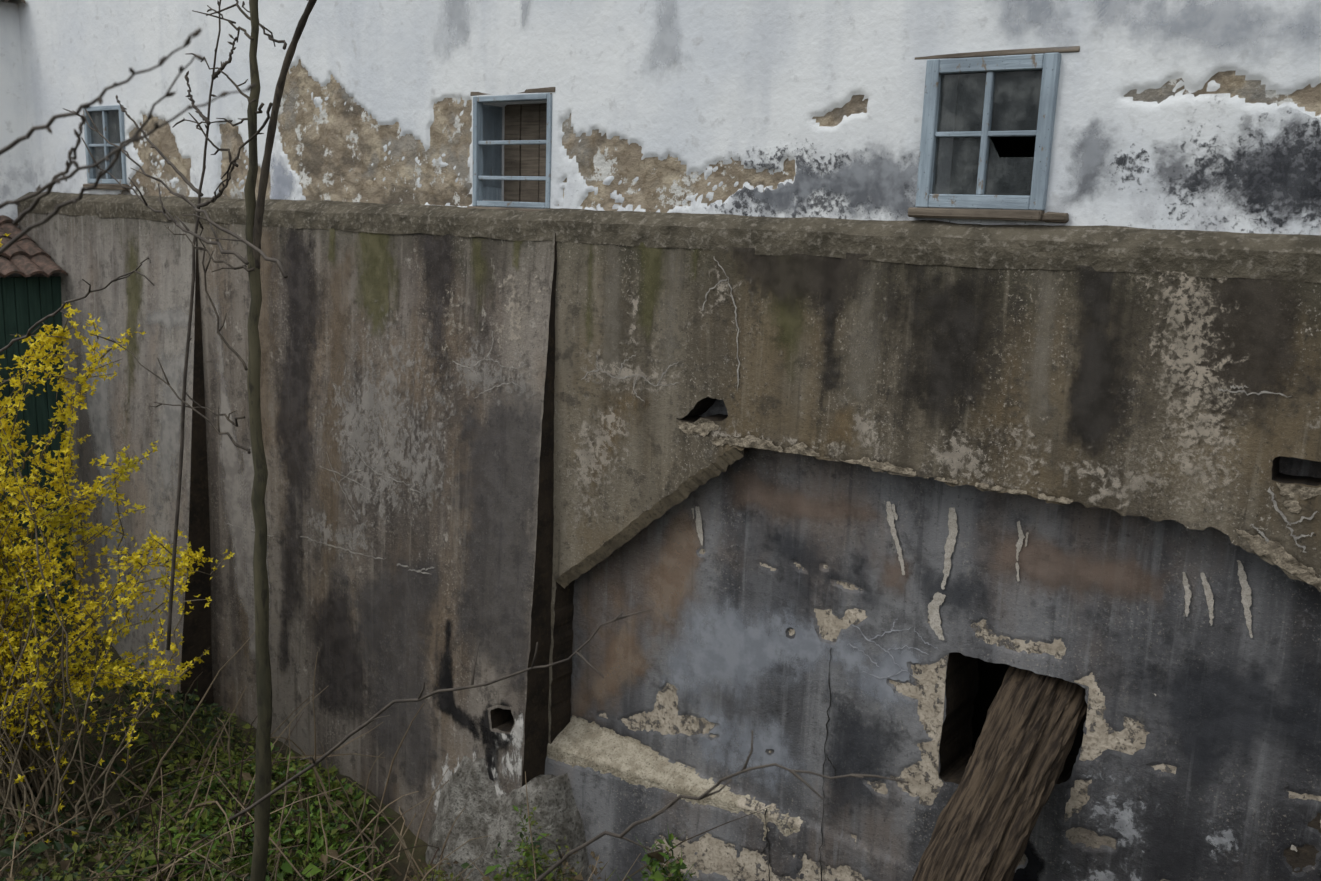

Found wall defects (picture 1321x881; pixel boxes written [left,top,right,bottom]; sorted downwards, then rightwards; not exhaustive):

flaking render [277,59,472,207]
flaking render [558,113,796,213]
water stain [710,143,918,220]
flaking render [812,95,868,127]
water stain [1072,111,1321,233]
flaking render [1124,70,1321,116]
water stain [214,230,547,674]
water stain [924,576,971,640]
water stain [314,564,524,812]
flaking render [547,683,872,881]
water stain [831,714,881,803]
flaking render [867,654,949,806]